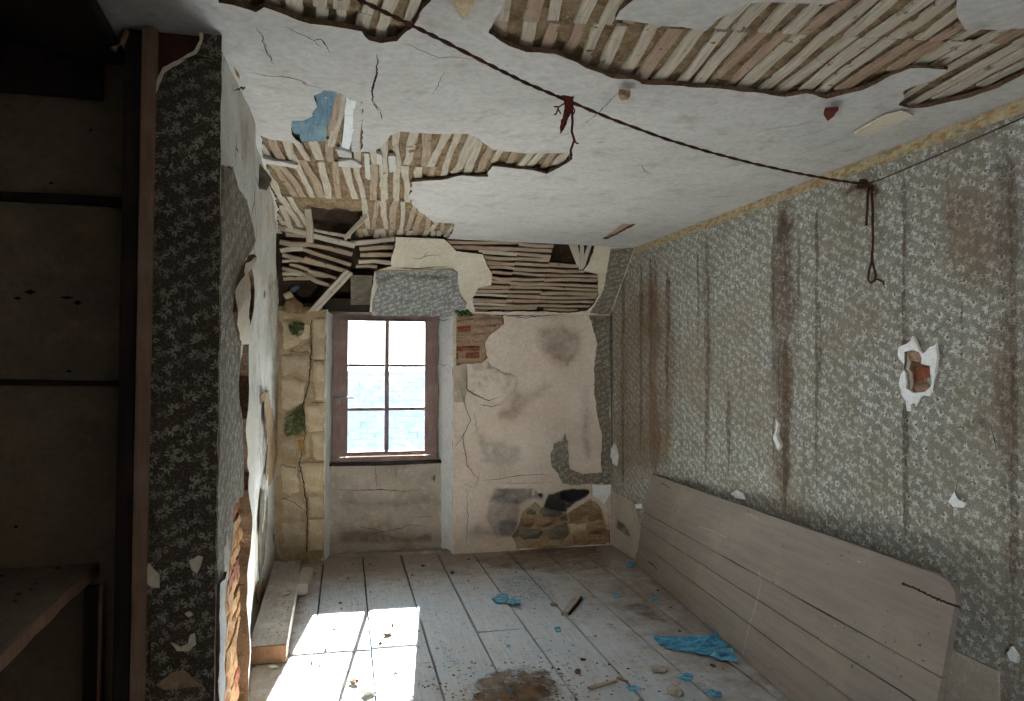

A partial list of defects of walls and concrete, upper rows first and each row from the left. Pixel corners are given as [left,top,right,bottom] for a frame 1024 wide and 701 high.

flaking render [238,0,425,38]
crack [371,55,382,120]
flaking render [490,0,1024,137]
crack [259,320,325,552]
flaking render [256,90,611,605]
crack [440,364,556,539]
leakage [492,489,589,512]
spalling [898,336,939,411]
flaking render [215,501,243,701]